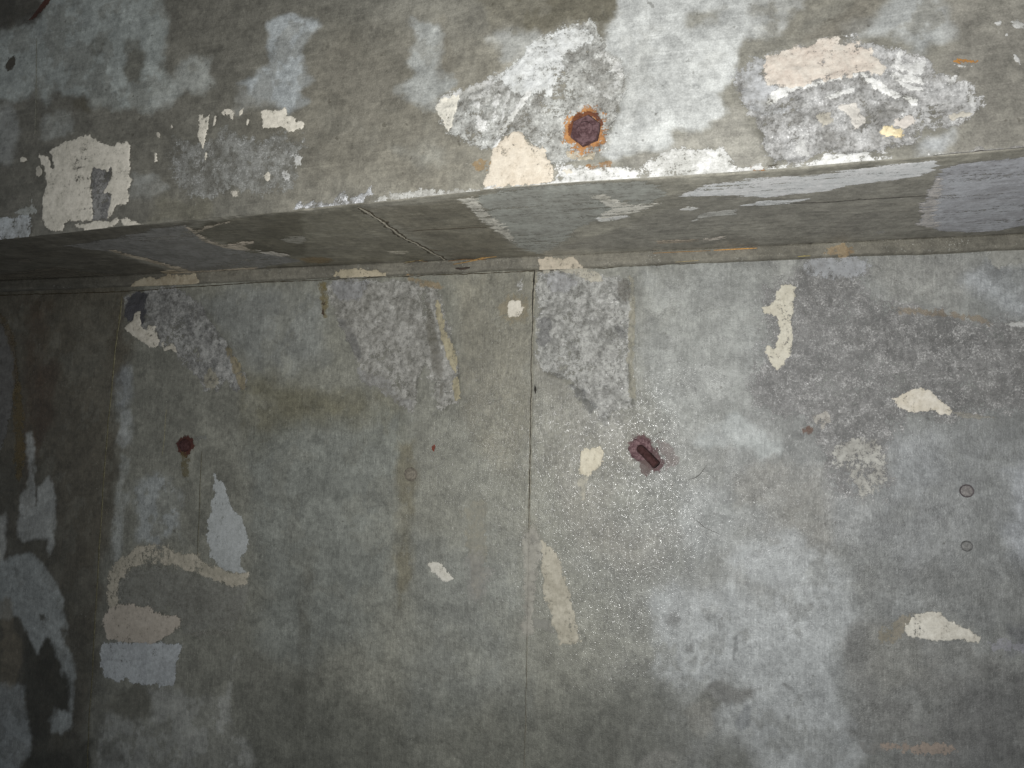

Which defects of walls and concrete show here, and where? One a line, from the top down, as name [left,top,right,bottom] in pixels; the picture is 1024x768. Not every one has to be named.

spalling [435,19,630,166]
corrosion [561,105,609,156]
spalling [731,33,986,165]
peeling [75,217,139,230]
crack [357,206,486,260]
spalling [322,277,461,412]
spalling [507,268,635,427]
corrosion [628,434,664,477]